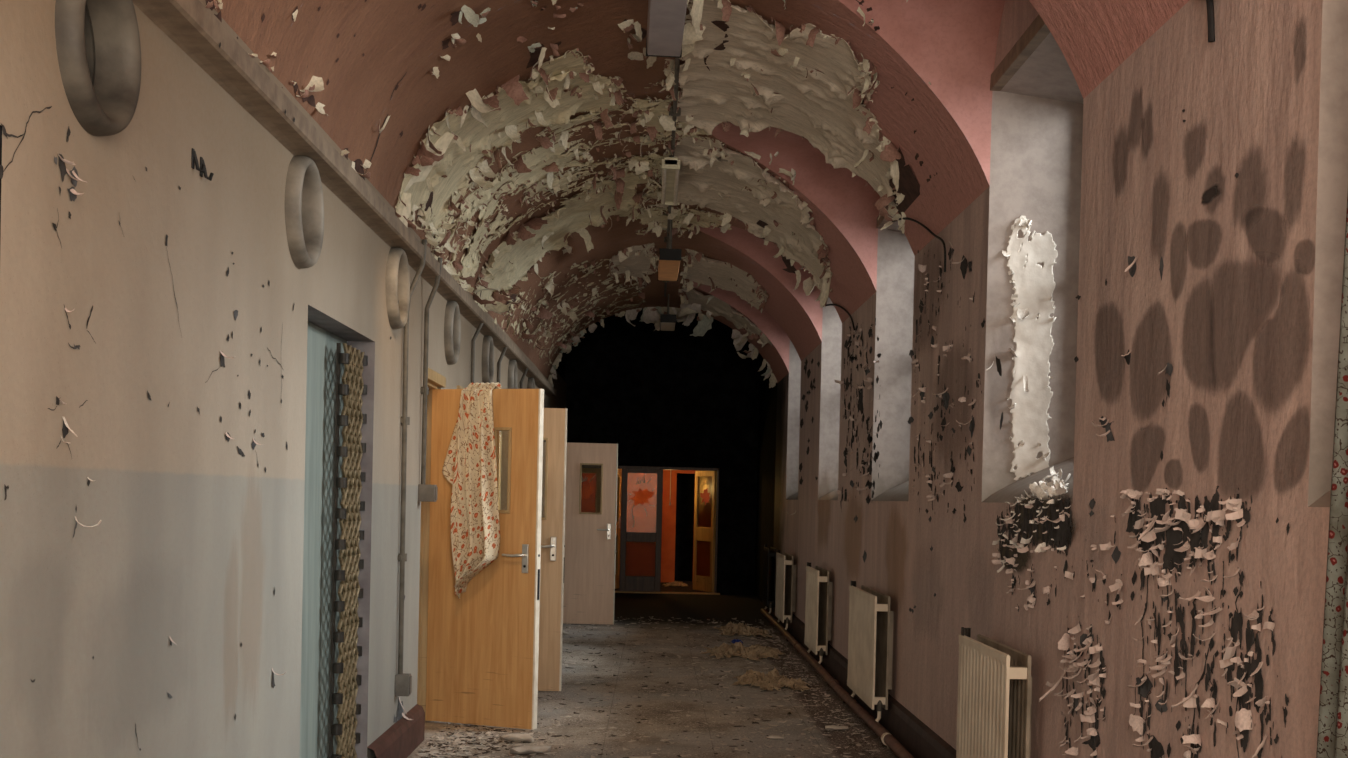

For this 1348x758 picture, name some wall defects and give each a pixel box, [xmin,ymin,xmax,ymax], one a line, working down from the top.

peeling [282,76,329,116]
crack [0,106,71,179]
flaking render [54,153,87,219]
peeling [341,148,372,180]
peeling [395,0,937,388]
leakage [1202,185,1220,204]
peeling [1124,256,1138,277]
peeling [908,215,1070,523]
peeling [799,358,820,485]
peeling [834,318,882,523]
peeling [1091,415,1115,442]
flaking render [992,486,1289,758]